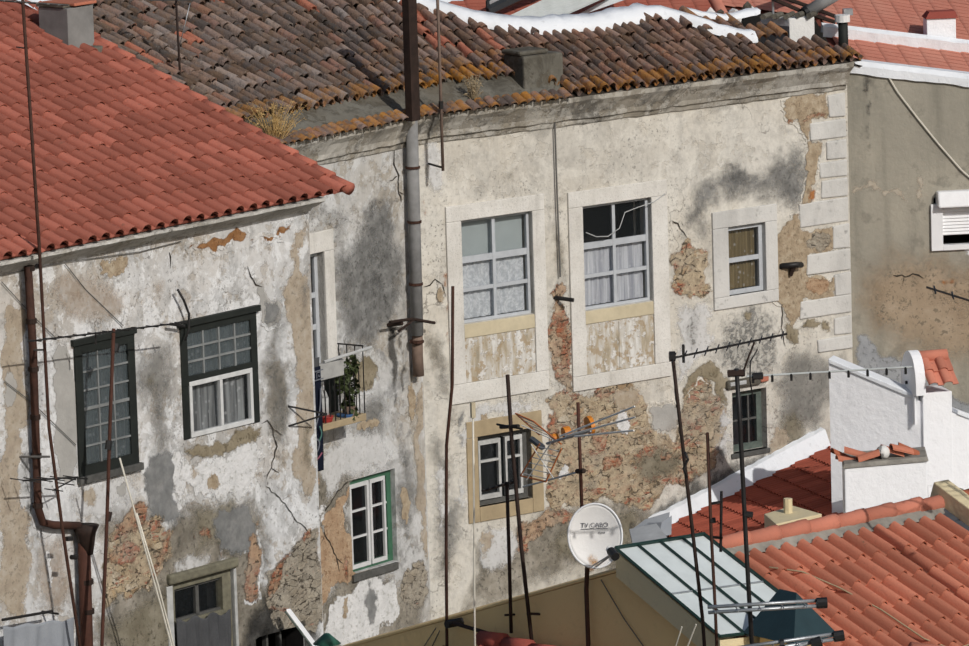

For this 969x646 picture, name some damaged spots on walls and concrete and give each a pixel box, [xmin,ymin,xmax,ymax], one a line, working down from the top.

water stain [695,153,806,217]
spalling [772,92,836,344]
flaking render [72,478,173,609]
peeling [184,219,391,632]
crack [263,420,349,569]
flaking render [480,238,775,570]